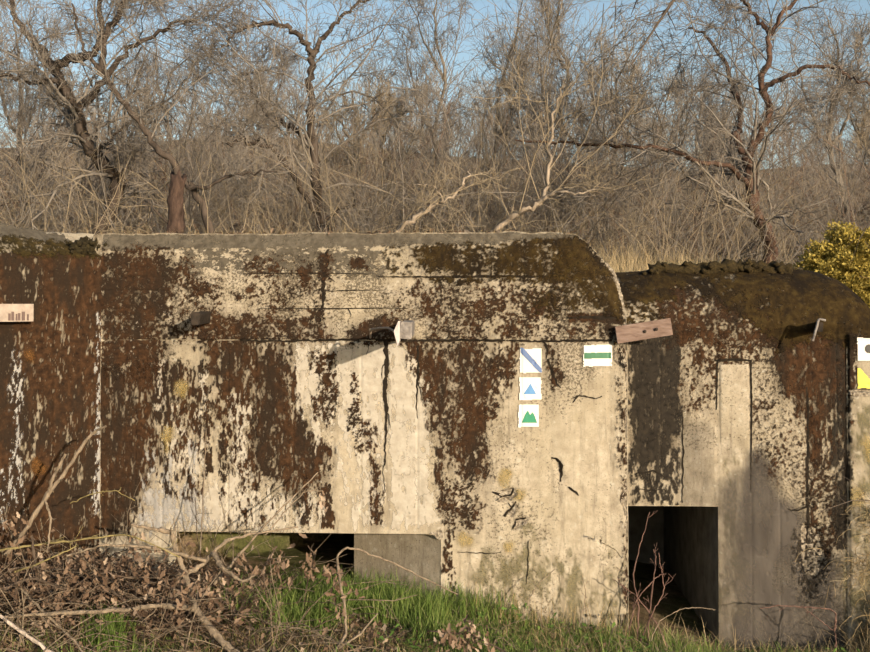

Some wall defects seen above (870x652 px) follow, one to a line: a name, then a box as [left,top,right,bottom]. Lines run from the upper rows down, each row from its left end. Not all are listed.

leakage [0,352,24,529]
leakage [91,313,101,514]
leakage [434,446,457,599]
spalling [497,488,528,530]
leakage [721,343,853,651]